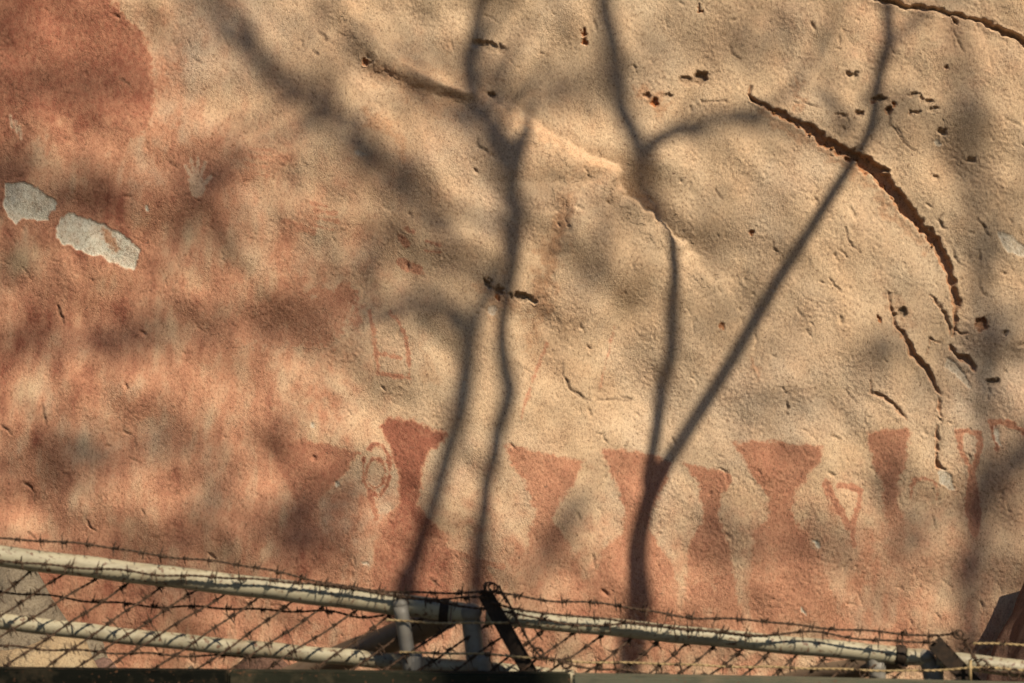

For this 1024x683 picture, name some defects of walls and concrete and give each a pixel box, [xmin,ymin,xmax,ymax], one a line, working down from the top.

crack [869,0,1024,50]
peeling [2,181,141,272]
crack [700,44,994,472]